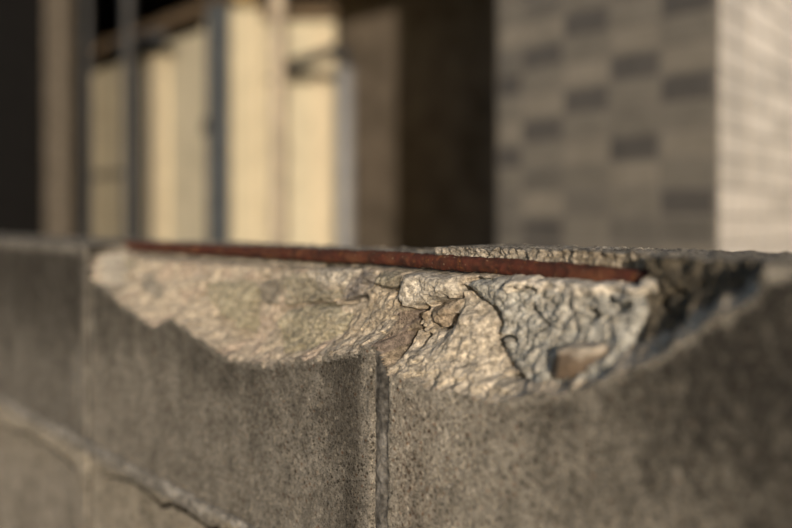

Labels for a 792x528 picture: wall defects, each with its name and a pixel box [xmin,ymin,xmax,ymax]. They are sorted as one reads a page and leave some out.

rust [121,241,649,284]
spalling [88,242,774,403]
crack [106,476,220,528]